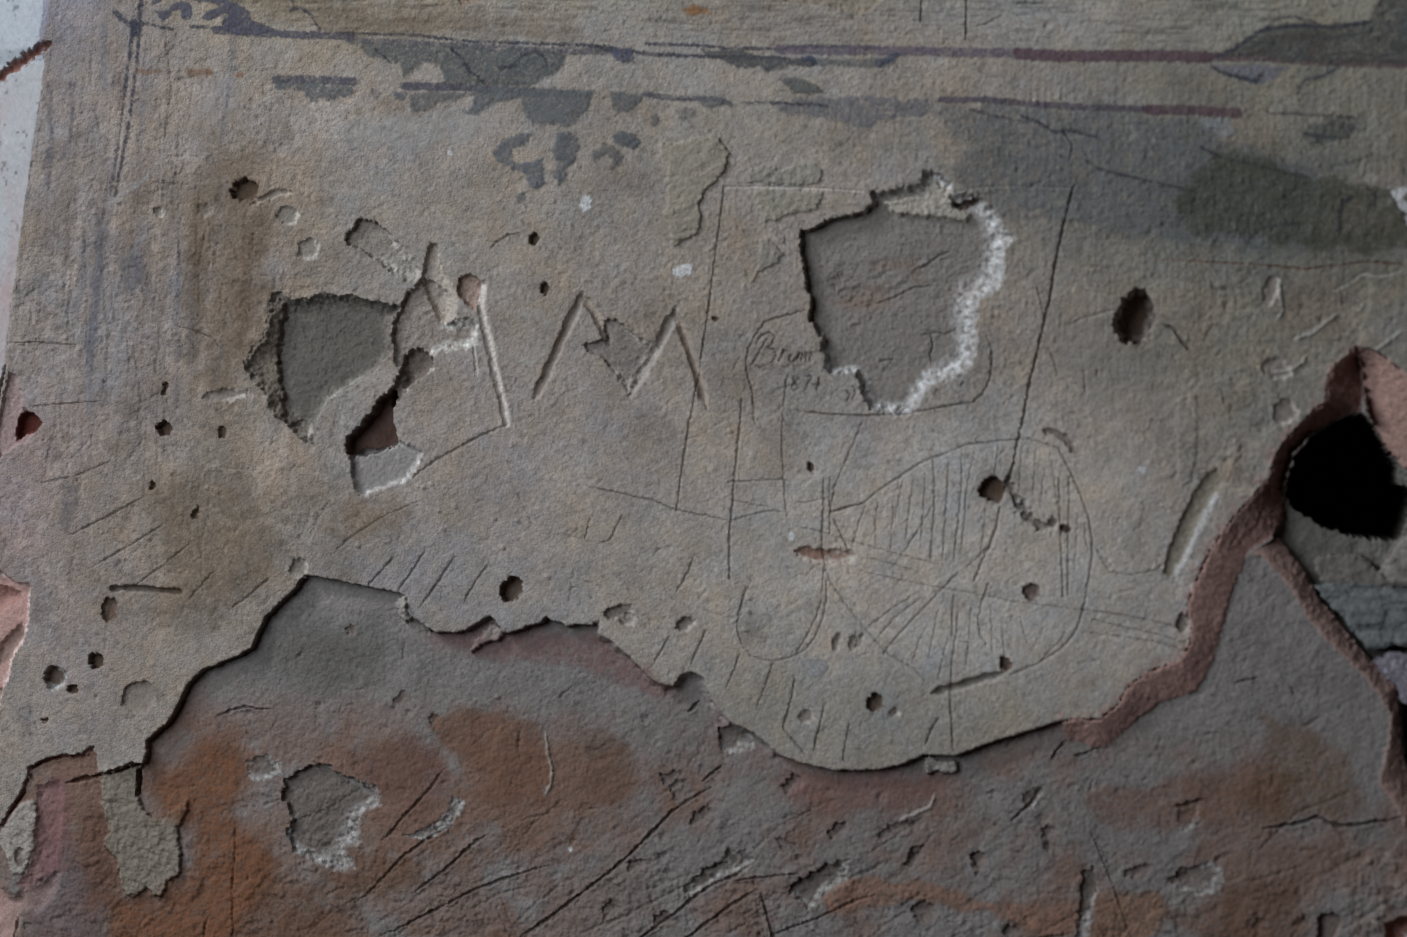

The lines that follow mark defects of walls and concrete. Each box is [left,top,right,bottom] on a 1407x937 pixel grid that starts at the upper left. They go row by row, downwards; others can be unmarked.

spalling [798,169,1018,417]
spalling [266,291,403,446]
peeling [345,388,424,497]
hole [1285,414,1407,541]
spalling [0,570,31,705]
peeling [100,597,118,623]
peeling [120,680,156,715]
spalling [595,621,755,756]
spalling [286,762,382,874]
spalling [683,847,759,897]
spalling [790,858,851,912]
spalling [1074,885,1099,937]